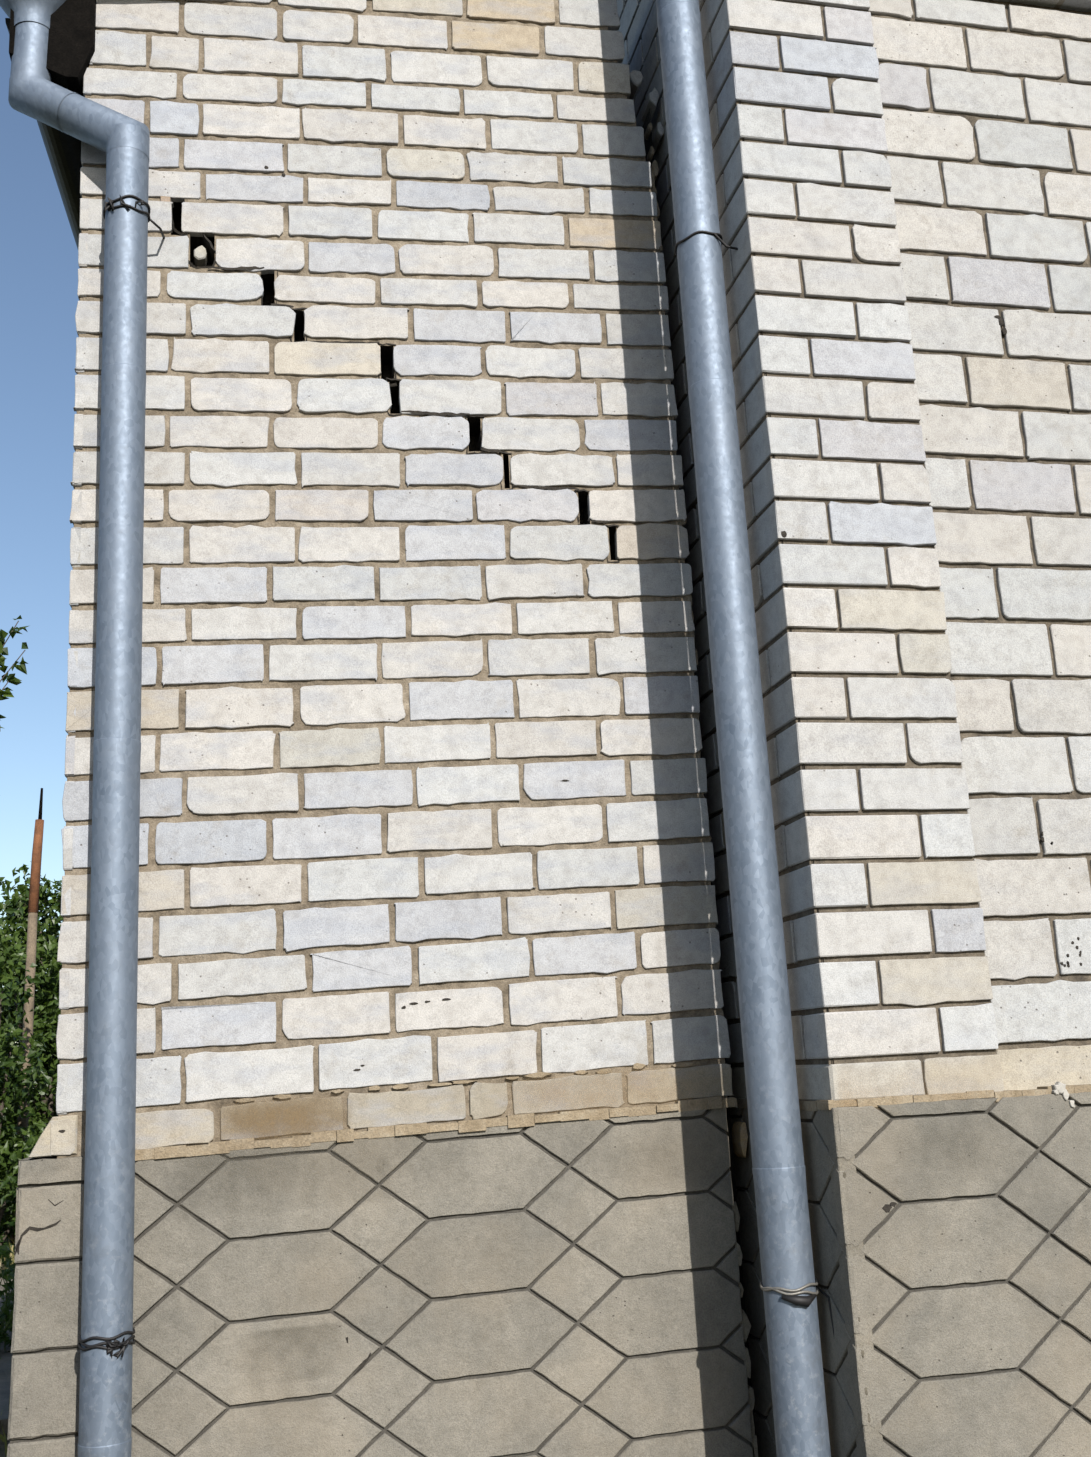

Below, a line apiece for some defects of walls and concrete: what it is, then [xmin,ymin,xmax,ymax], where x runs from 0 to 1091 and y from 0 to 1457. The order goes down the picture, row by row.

crack [627,70,664,253]
crack [160,196,620,563]
crack [725,1058,758,1457]